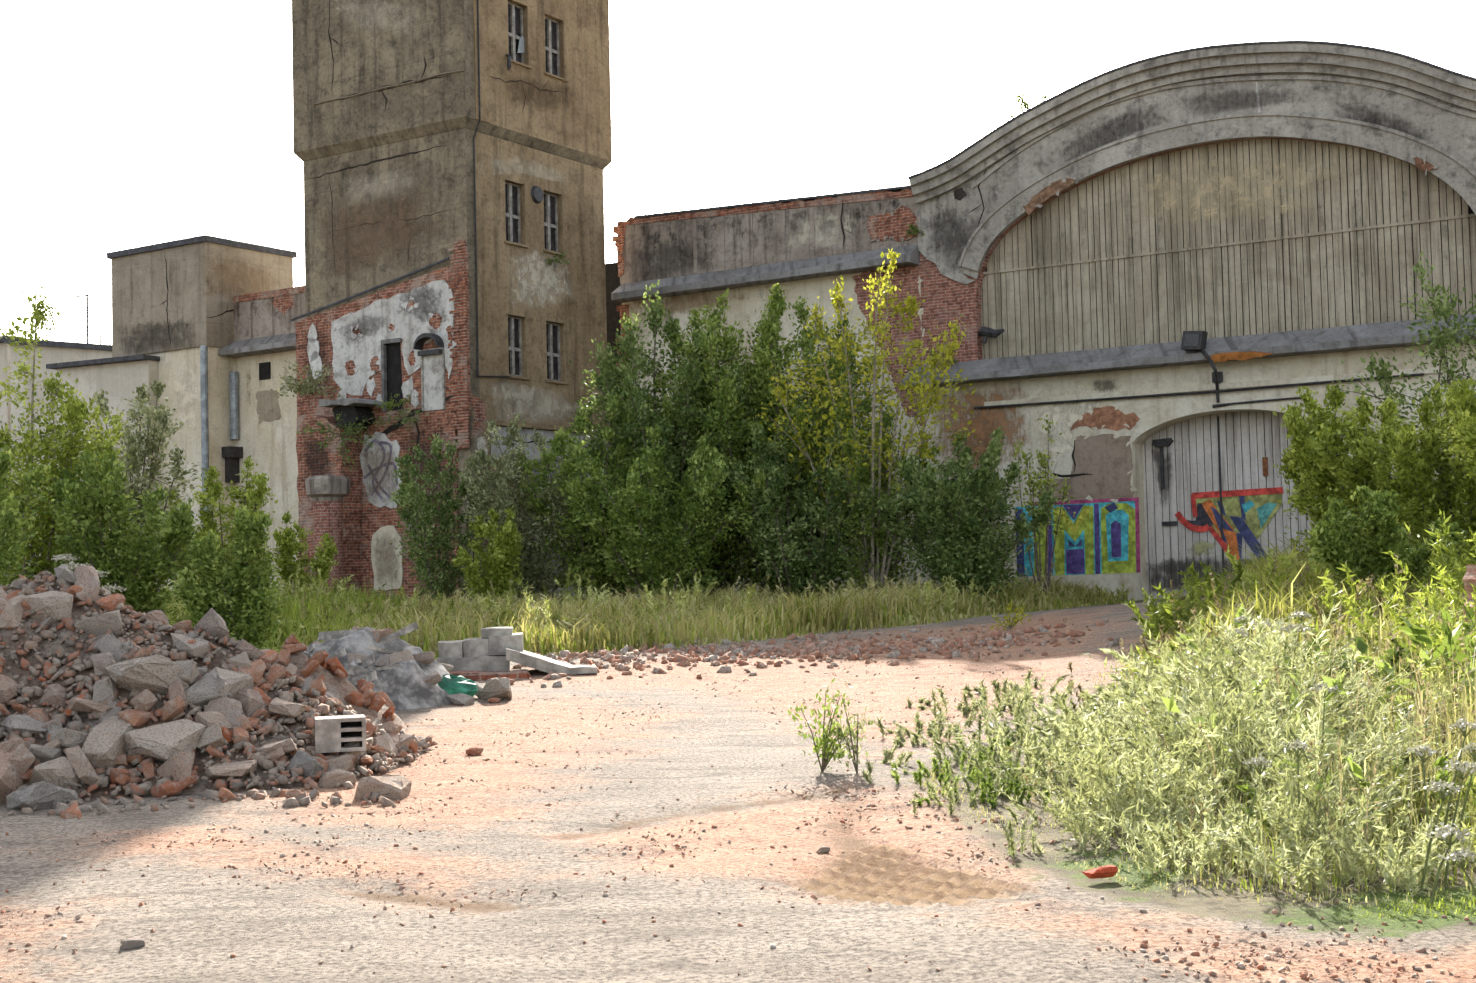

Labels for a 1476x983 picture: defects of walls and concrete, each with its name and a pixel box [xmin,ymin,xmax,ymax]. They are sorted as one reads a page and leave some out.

crack [328,0,448,109]
spalling [862,204,921,244]
spalling [1019,173,1079,216]
flaking render [307,279,458,408]
spalling [850,259,927,426]
spalling [1038,403,1140,503]
flaking render [360,432,404,591]